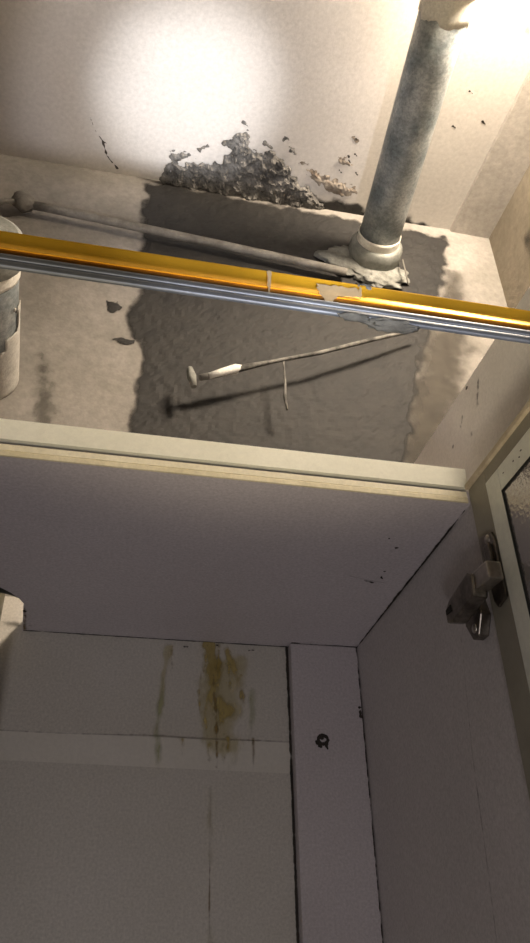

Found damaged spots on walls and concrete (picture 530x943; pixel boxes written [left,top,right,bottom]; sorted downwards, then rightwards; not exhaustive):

spalling [159,120,359,210]
water stain [199,642,245,757]